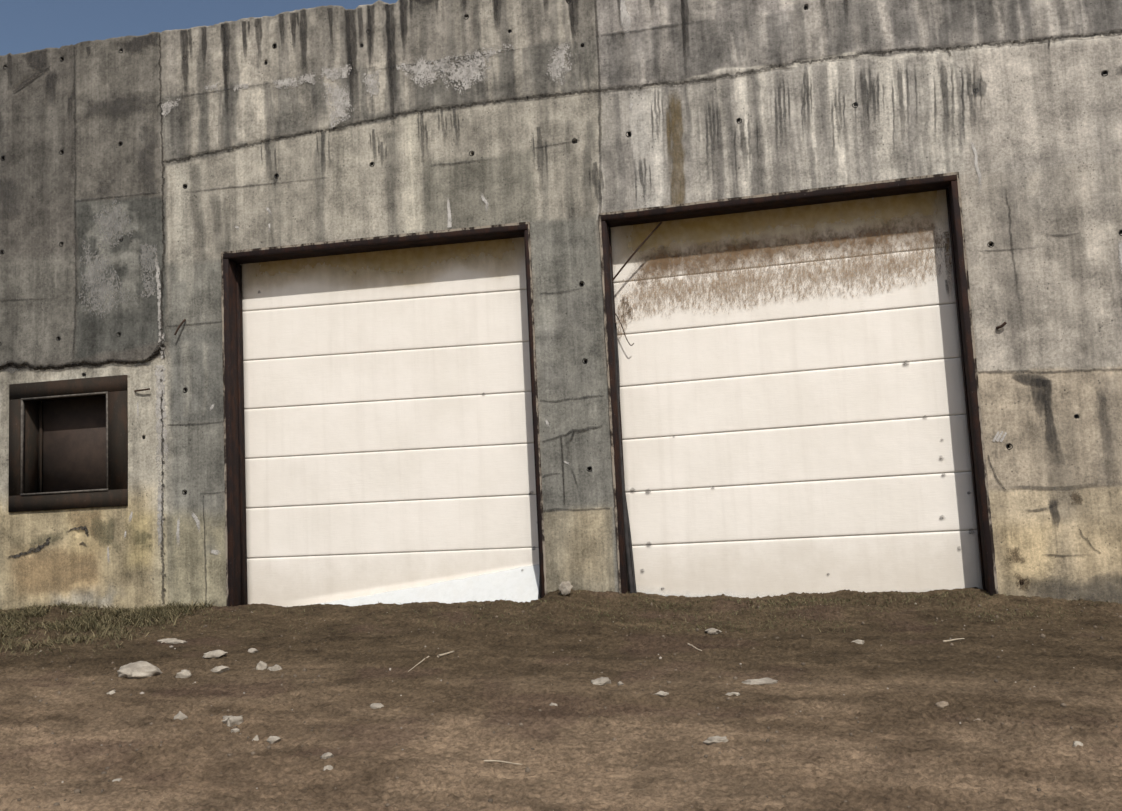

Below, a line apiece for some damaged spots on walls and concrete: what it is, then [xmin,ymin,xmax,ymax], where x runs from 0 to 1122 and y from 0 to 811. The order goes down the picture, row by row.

damp [569,0,578,27]
damp [618,0,631,26]
damp [26,49,55,94]
damp [118,34,155,52]
damp [181,26,207,78]
damp [205,18,262,95]
damp [273,0,514,151]
damp [546,42,573,85]
damp [161,99,180,119]
crack [158,1,1122,605]
damp [1016,374,1057,446]
damp [1050,501,1059,520]